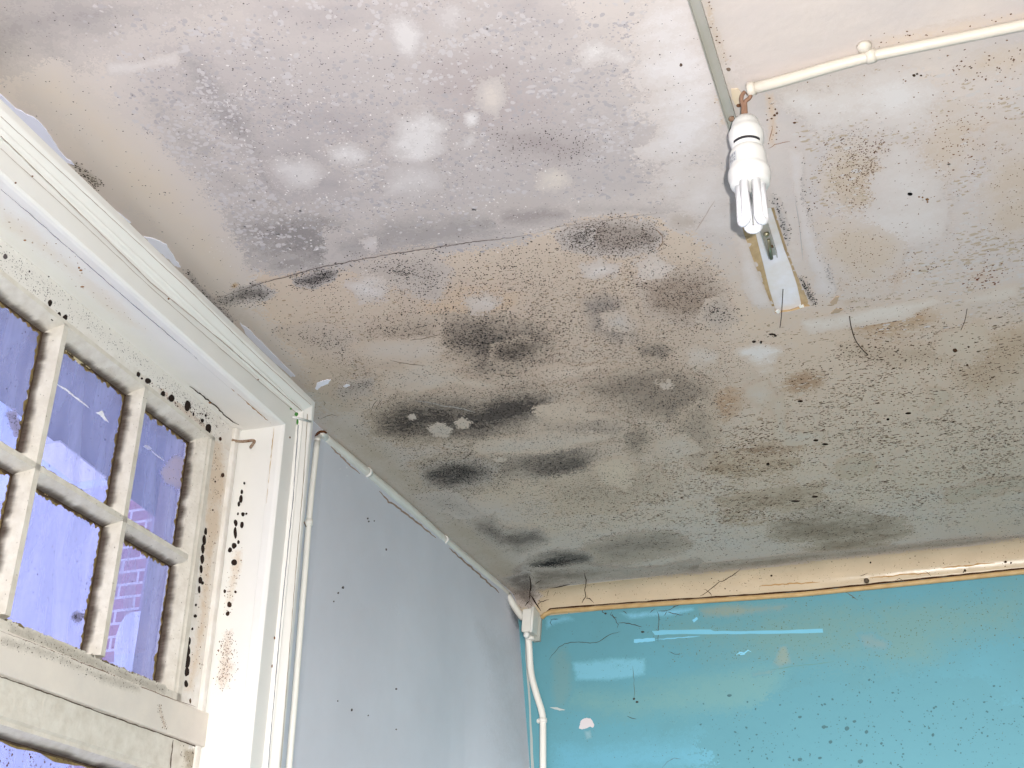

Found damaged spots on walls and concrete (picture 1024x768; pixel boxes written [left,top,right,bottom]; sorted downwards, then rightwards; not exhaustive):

crack [214,213,663,299]
leakage [0,0,1024,609]
leakage [0,204,247,729]
crack [525,575,541,611]
crack [550,612,679,658]
flaking render [579,718,594,729]